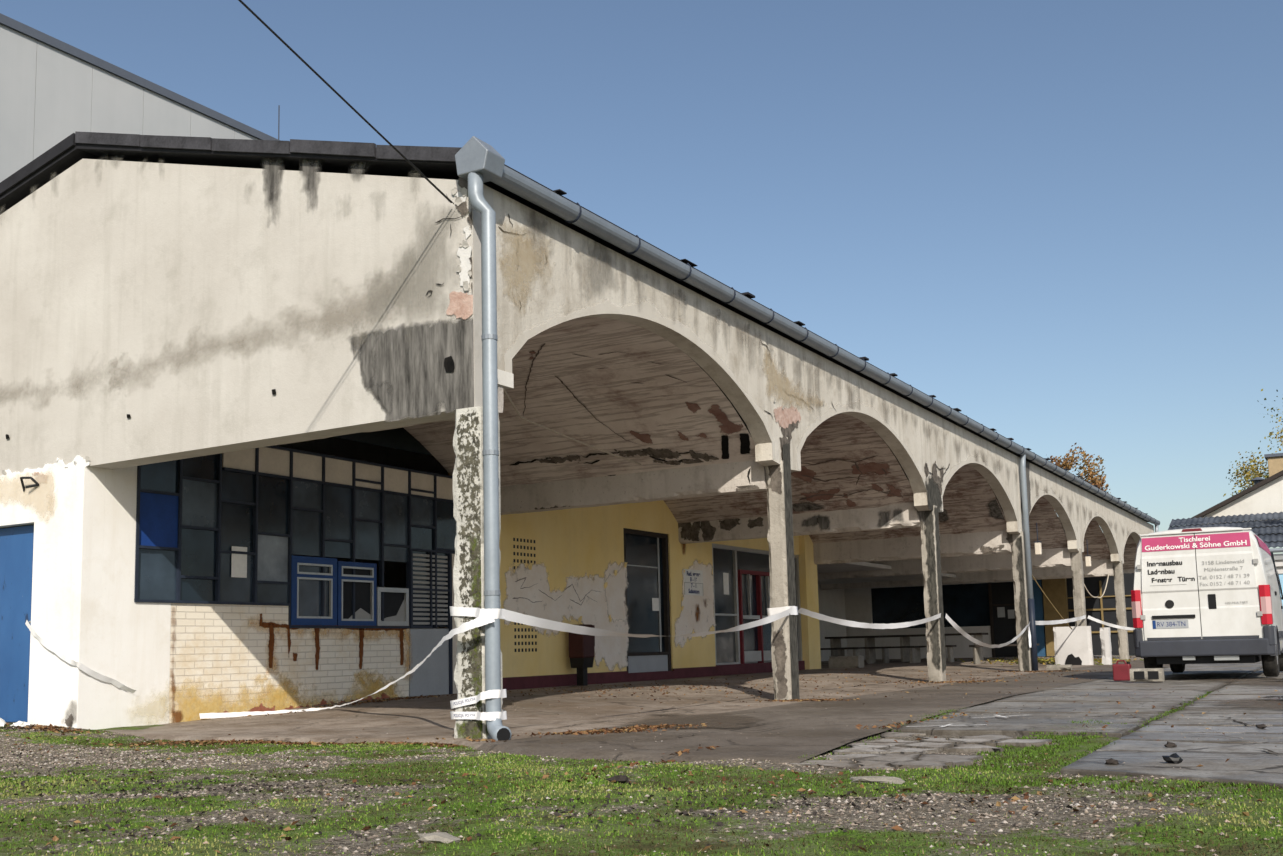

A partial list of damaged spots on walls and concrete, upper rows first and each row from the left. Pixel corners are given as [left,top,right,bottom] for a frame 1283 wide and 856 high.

leakage [264,159,282,205]
leakage [302,159,320,205]
flaking render [446,176,473,319]
leakage [321,217,474,422]
flaking render [614,402,743,465]
flaking render [736,354,856,507]
spalling [678,517,764,541]
rust [259,614,409,671]
spalling [456,410,486,739]
peeling [503,562,629,671]
peeling [675,559,716,647]
leakage [457,720,483,739]